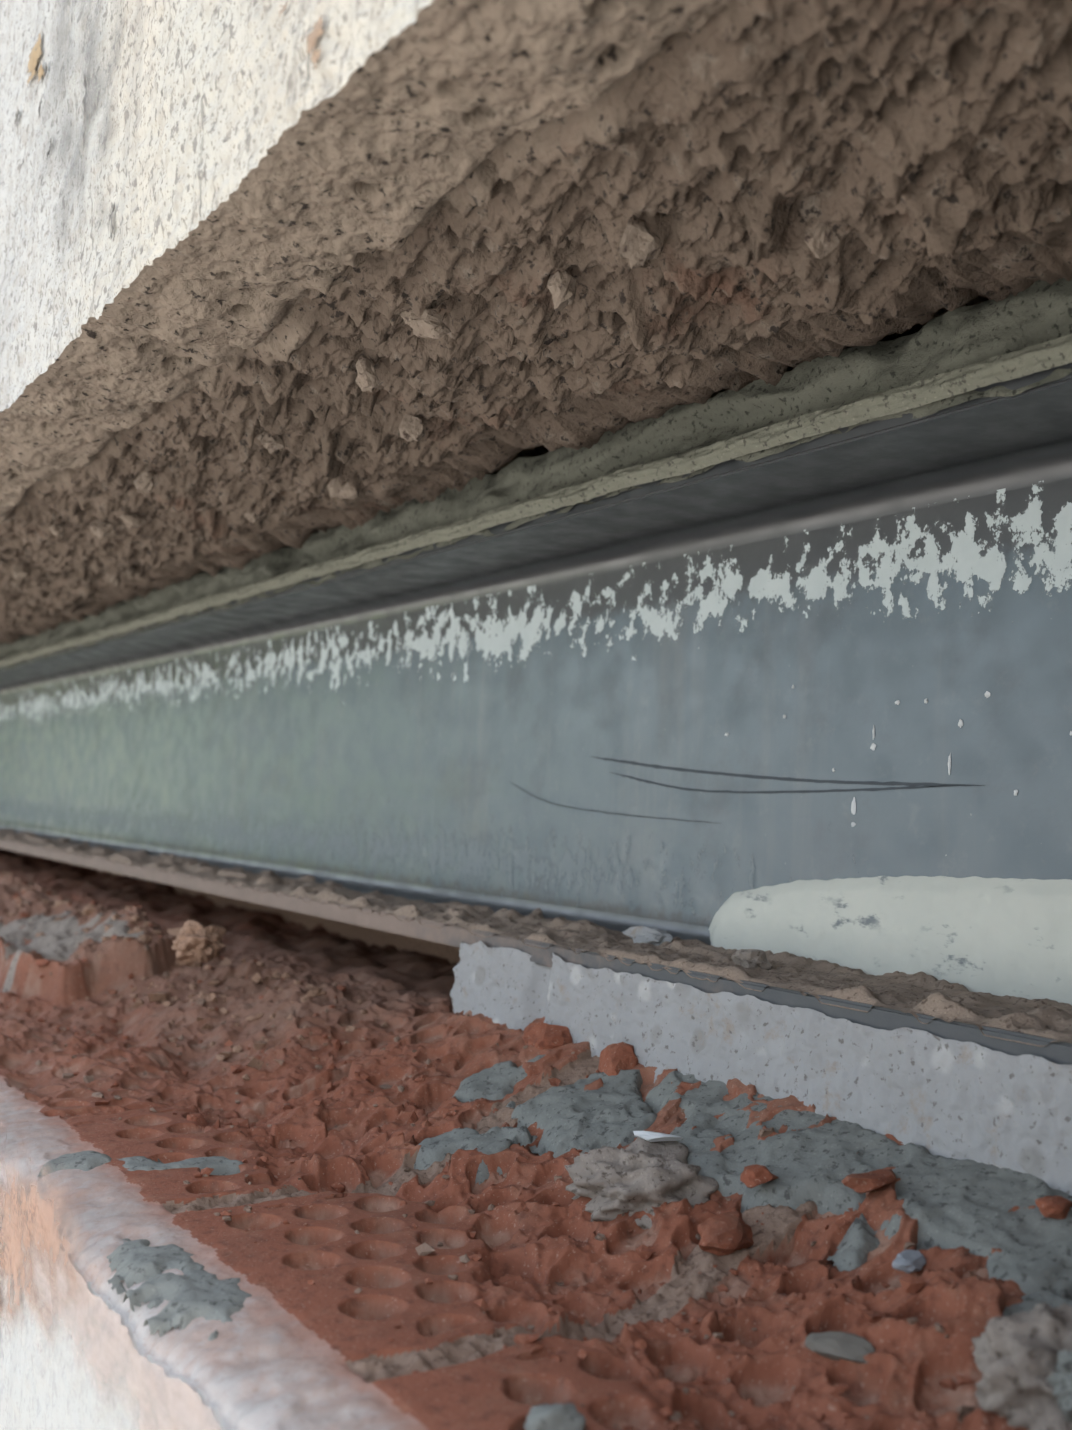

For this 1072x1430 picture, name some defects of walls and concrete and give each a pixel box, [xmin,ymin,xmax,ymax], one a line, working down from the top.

spalling [355,355,379,393]
spalling [399,414,425,442]
spalling [257,431,285,454]
peeling [0,479,1072,727]
spalling [522,1022,573,1050]
spalling [598,1042,638,1076]
peeling [633,1131,683,1142]
spalling [740,1164,778,1188]
spalling [841,1169,897,1194]
spalling [1035,1196,1072,1219]
spalling [892,1250,926,1273]
spalling [805,1331,876,1364]